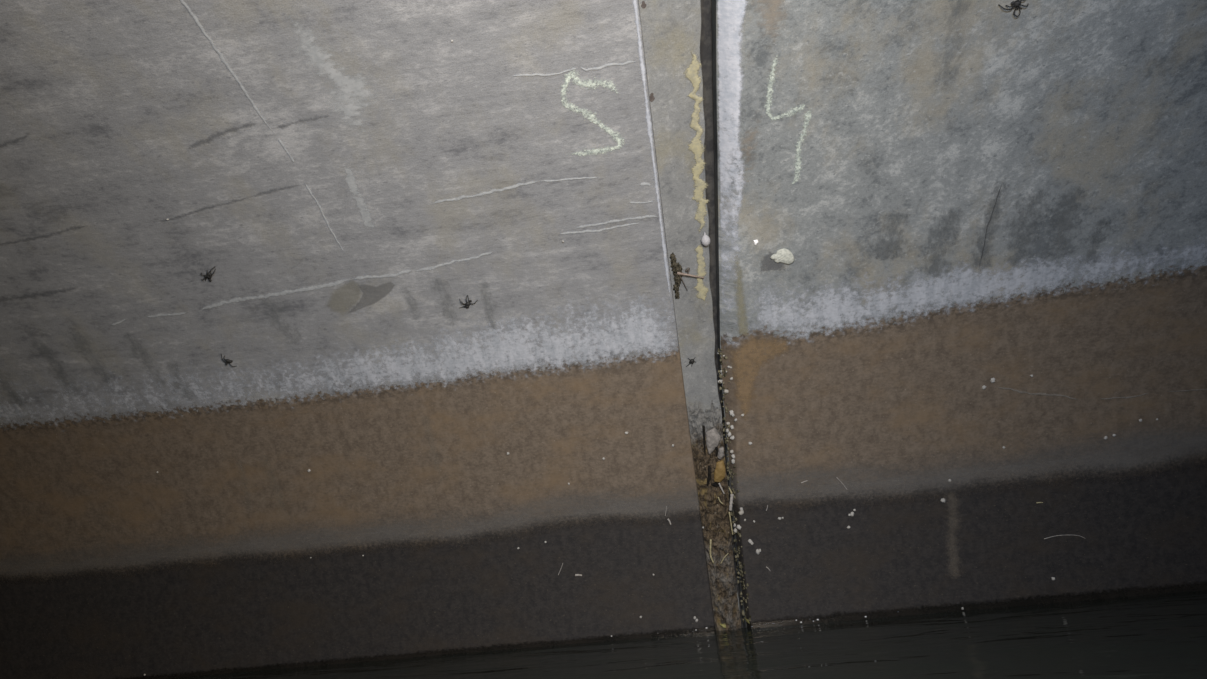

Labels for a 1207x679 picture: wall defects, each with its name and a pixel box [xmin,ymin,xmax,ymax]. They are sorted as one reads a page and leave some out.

damp [294,23,377,125]
damp [633,0,670,293]
damp [0,296,716,679]